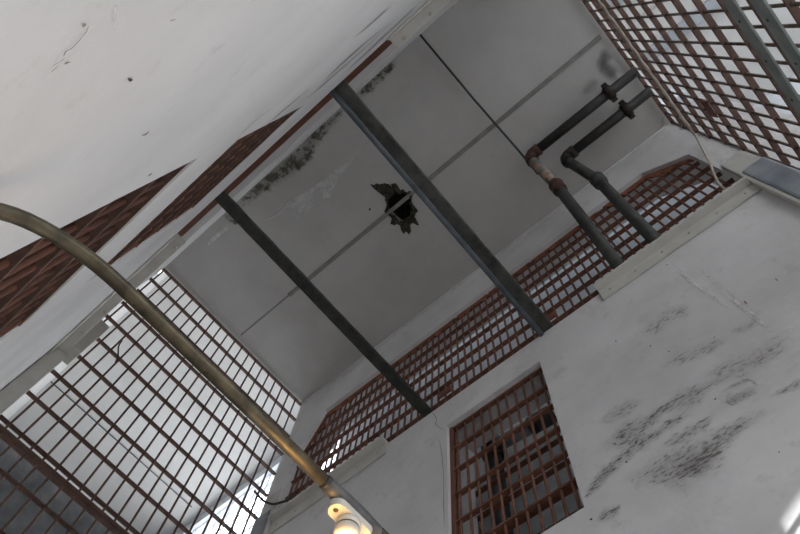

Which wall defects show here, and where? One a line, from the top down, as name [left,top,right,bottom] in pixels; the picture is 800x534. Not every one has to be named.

damp [360,63,393,94]
damp [242,111,342,201]
damp [586,385,750,496]